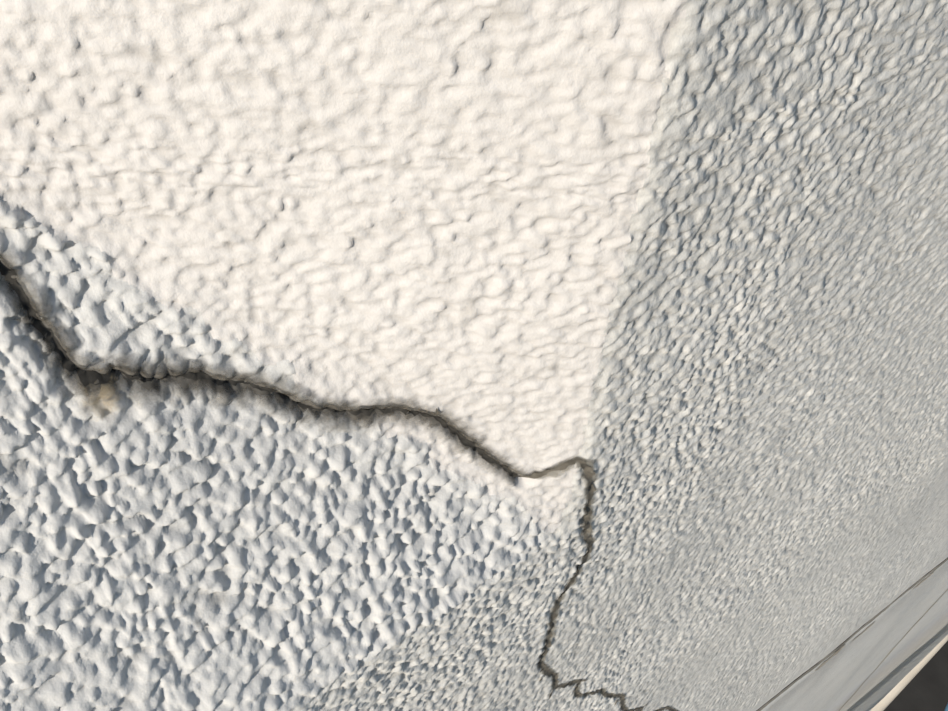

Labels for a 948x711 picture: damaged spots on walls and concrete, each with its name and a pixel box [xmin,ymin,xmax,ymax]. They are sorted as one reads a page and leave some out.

crack [0,255,677,711]